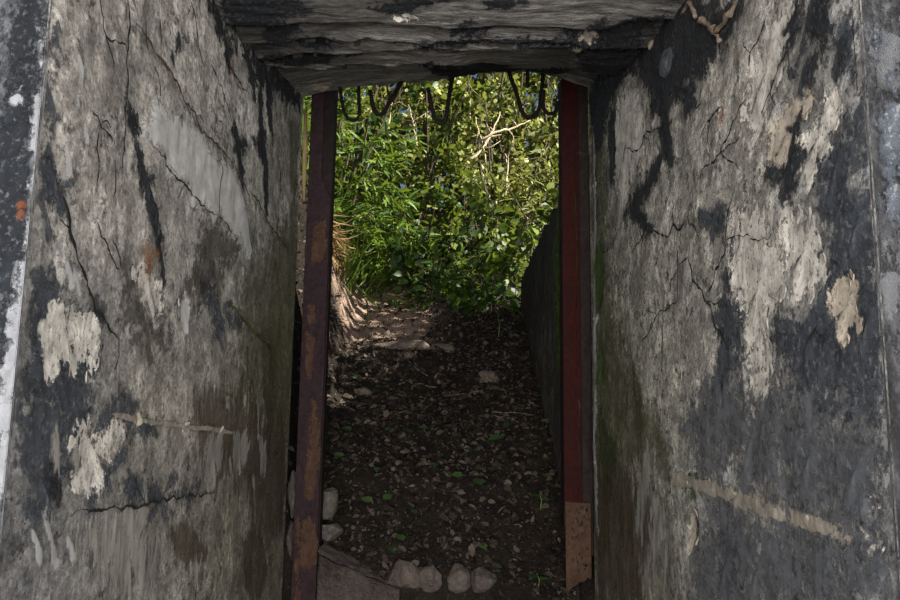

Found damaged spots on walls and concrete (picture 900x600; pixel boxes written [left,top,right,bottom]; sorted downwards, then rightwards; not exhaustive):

crack [92,0,290,253]
water stain [623,77,697,240]
peeling [728,0,863,406]
peeling [37,298,101,386]
water stain [0,0,268,600]
crack [601,198,772,372]
water stain [678,0,900,600]
peeling [67,413,125,500]
crack [71,488,218,517]
rust [294,516,319,600]
rust [304,399,322,500]
spalling [686,507,699,557]